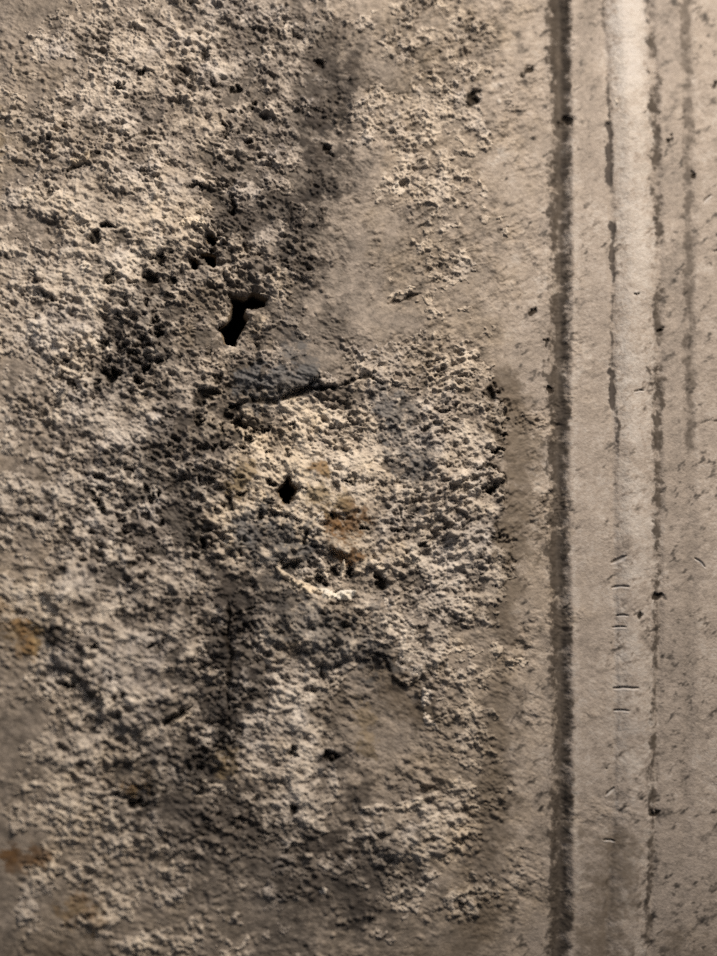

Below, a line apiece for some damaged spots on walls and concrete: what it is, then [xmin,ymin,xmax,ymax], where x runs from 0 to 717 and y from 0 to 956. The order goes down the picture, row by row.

leakage [543,0,573,71]
spalling [466,92,479,107]
leakage [648,71,662,113]
peeling [68,149,90,168]
leakage [220,110,356,242]
peeling [80,260,92,275]
leakage [608,221,616,282]
leakage [607,332,621,444]
corrosion [0,0,525,956]
leakage [486,370,543,563]
peeling [273,562,529,794]
leakage [641,786,656,942]